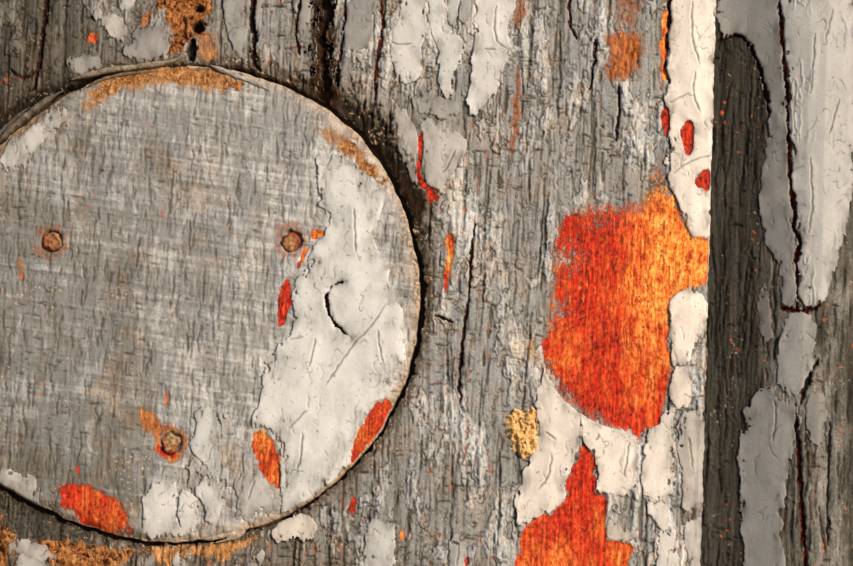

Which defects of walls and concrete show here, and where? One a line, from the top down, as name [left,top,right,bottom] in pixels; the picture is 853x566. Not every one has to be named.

peeling [223,0,251,64]
peeling [292,0,312,43]
peeling [341,0,380,51]
peeling [387,0,516,206]
peeling [514,0,853,566]
peeling [56,154,407,543]
rust [140,407,191,463]
peeling [0,468,47,505]
peeling [8,539,57,566]
peeling [172,550,193,566]
peeling [359,515,405,566]
peeling [448,533,470,566]